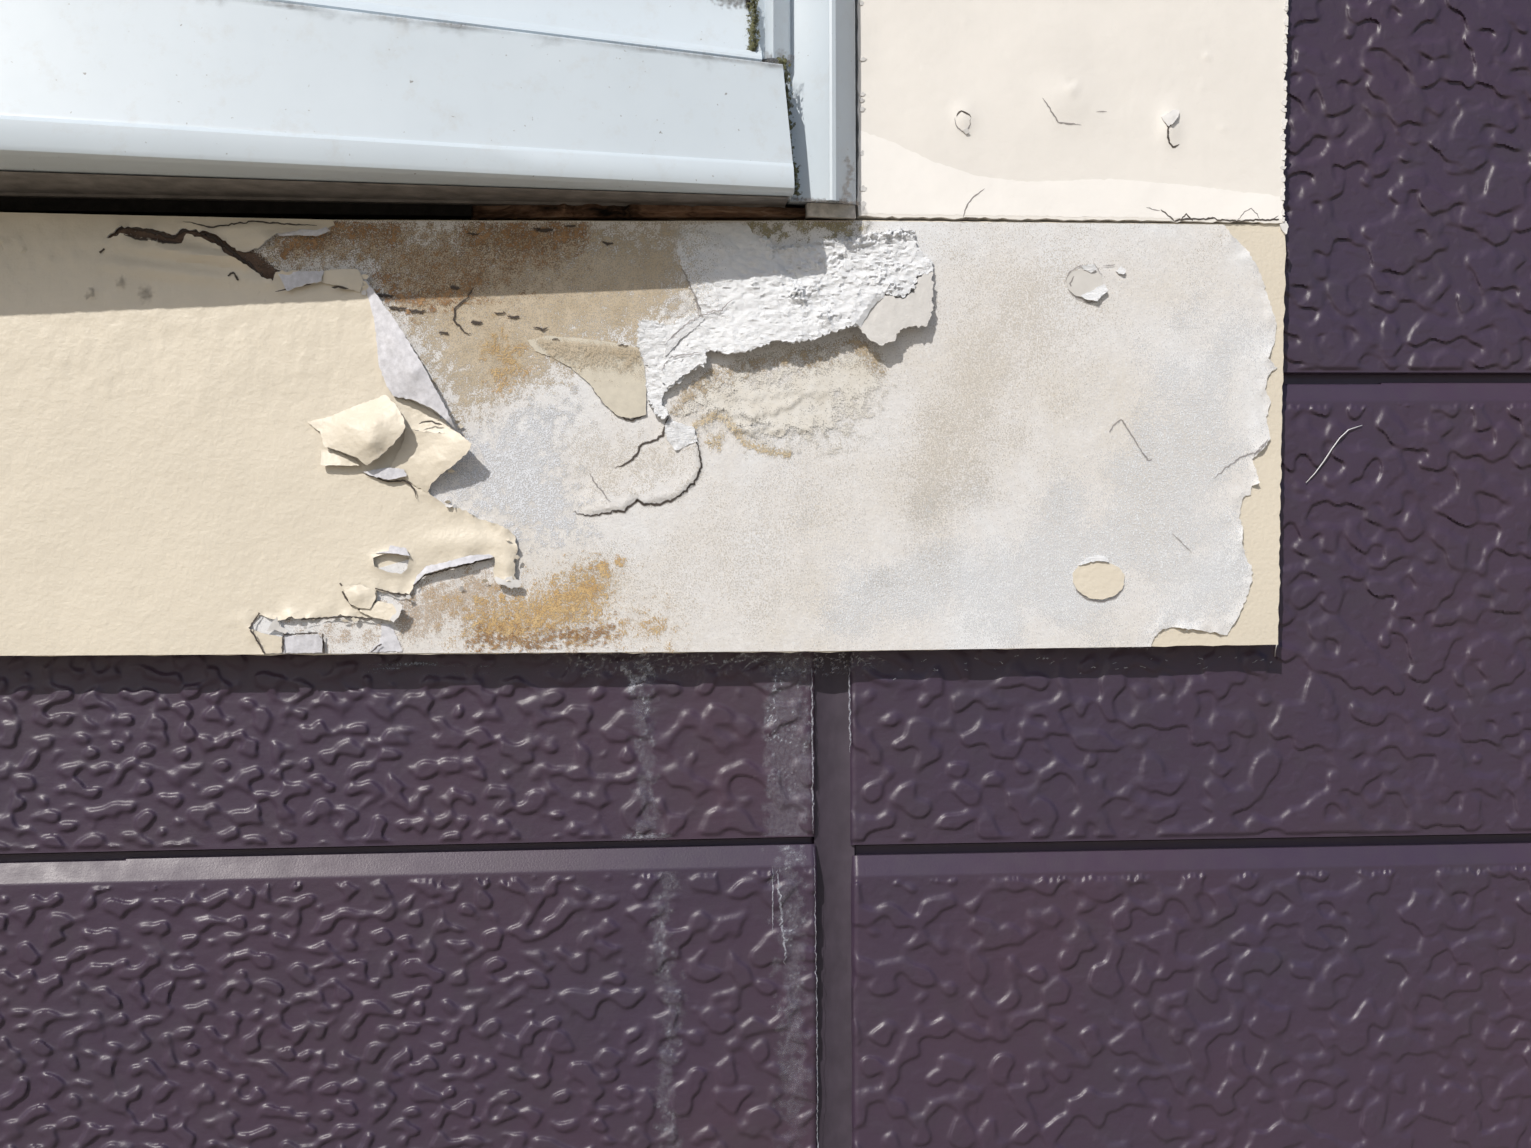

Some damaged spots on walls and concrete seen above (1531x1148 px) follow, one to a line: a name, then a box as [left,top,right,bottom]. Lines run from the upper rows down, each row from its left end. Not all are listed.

rust [256,219,591,398]
peeling [250,185,1277,654]
rust [285,550,686,654]
leakage [772,868,792,965]
leakage [790,852,819,1145]